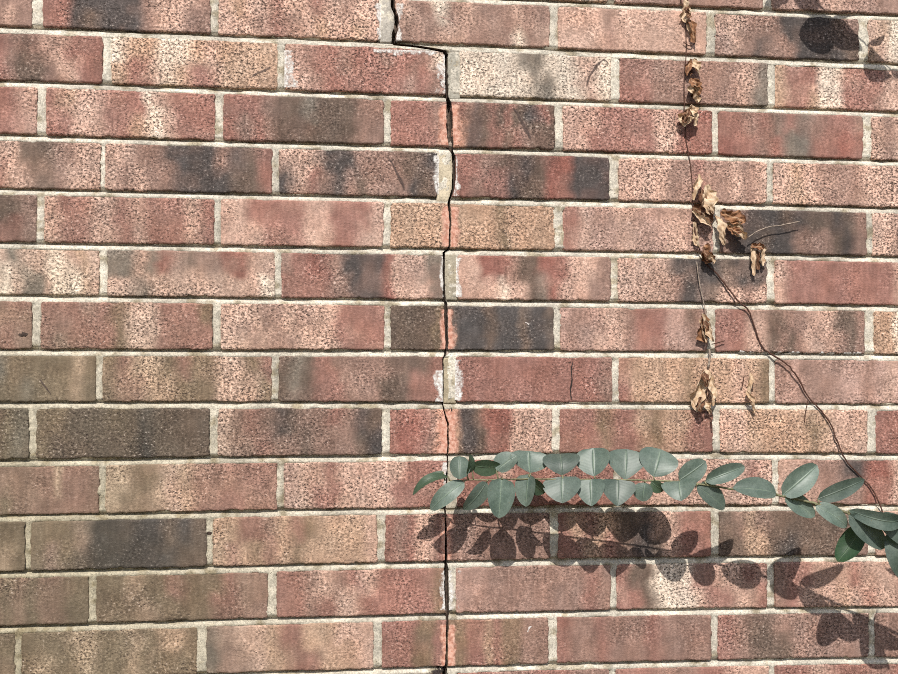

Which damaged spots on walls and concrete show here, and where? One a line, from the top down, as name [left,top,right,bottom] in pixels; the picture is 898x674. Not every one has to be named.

crack [391,0,455,483]
crack [432,506,449,674]